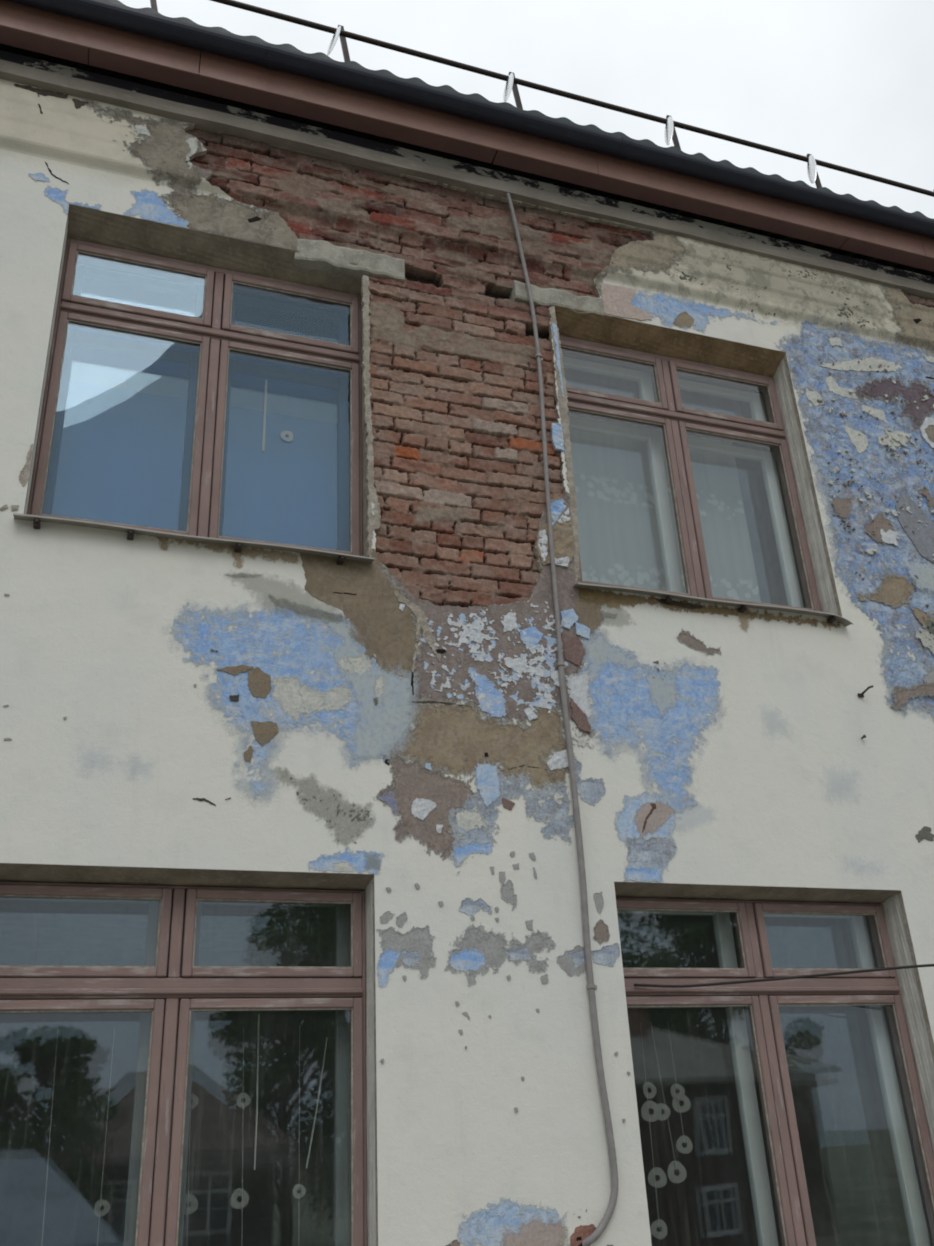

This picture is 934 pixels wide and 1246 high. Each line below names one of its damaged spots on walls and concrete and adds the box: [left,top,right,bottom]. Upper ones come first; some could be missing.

peeling [28,162,102,215]
peeling [774,284,934,719]
flaking render [79,97,778,988]
peeling [915,826,934,843]
peeling [445,1197,596,1246]